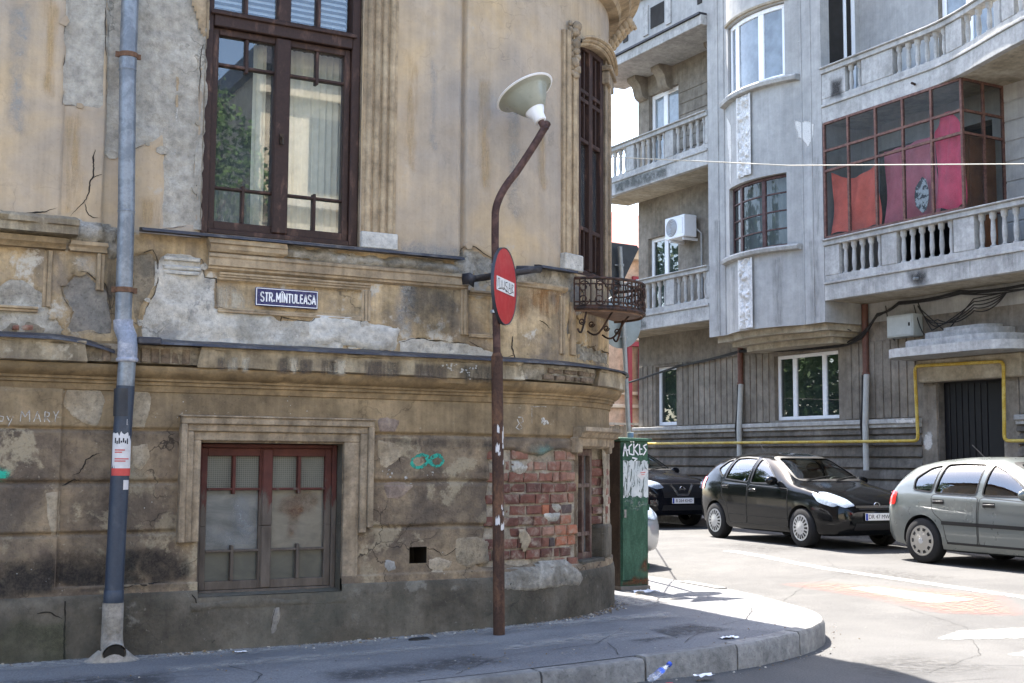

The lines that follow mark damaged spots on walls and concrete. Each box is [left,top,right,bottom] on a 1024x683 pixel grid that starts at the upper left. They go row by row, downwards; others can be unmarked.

flaking render [59,0,121,159]
flaking render [135,0,210,230]
crack [2,152,102,218]
flaking render [0,268,113,335]
flaking render [132,250,158,326]
peeling [63,390,105,426]
crack [62,453,99,486]
flaking render [429,448,578,572]